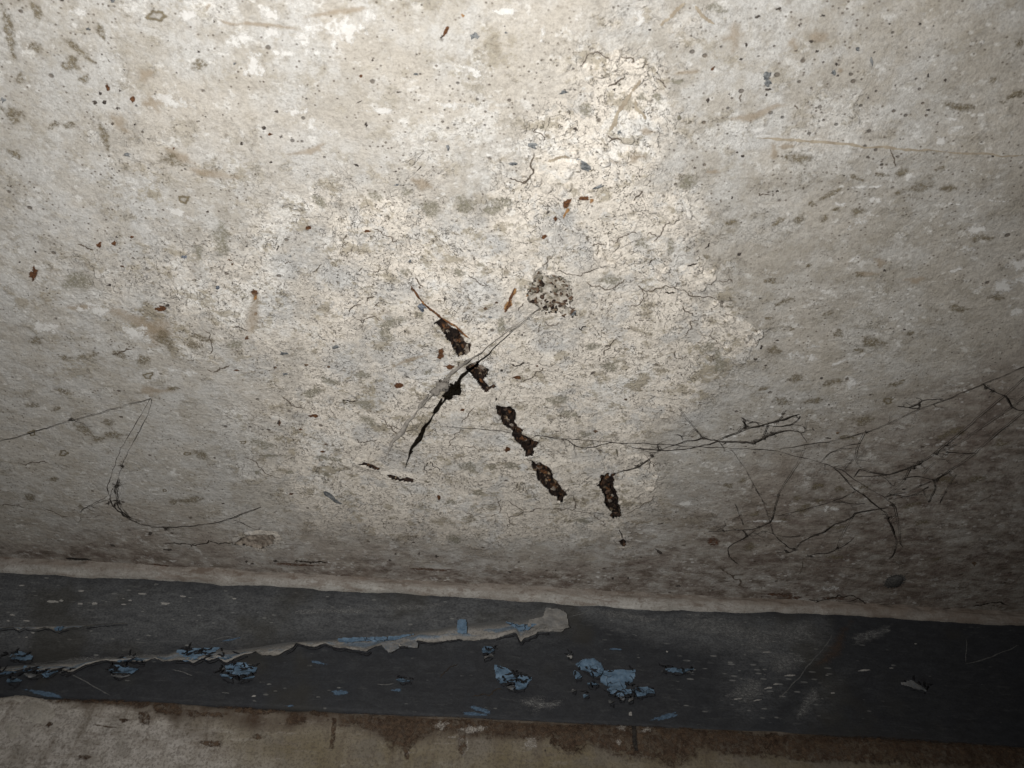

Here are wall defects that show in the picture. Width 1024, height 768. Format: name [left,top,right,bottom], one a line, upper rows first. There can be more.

spalling [516,262,585,325]
spalling [417,297,573,506]
crack [424,408,477,472]
peeling [590,449,660,522]
peeling [0,607,570,693]
peeling [564,649,655,708]